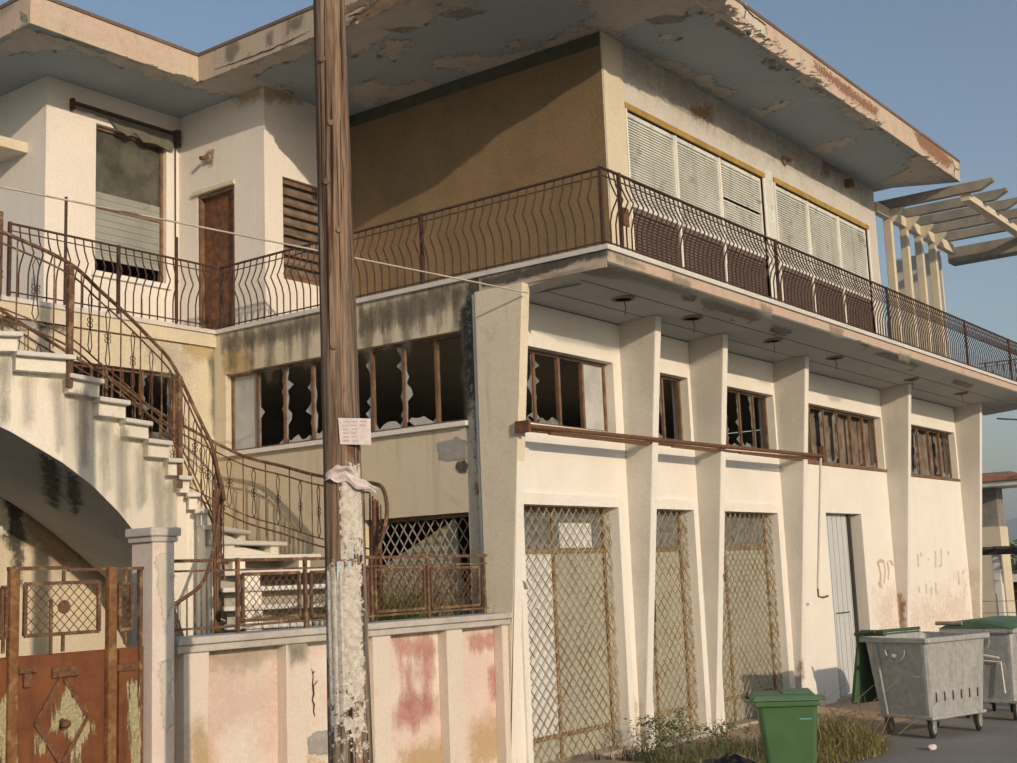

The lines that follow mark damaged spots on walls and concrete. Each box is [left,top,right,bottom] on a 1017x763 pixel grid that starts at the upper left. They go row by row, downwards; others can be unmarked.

spalling [345,0,404,26]
peeling [0,12,314,98]
peeling [348,78,433,109]
peeling [427,0,956,185]
corrosion [690,101,713,122]
water stain [38,453,81,514]
water stain [2,500,103,576]